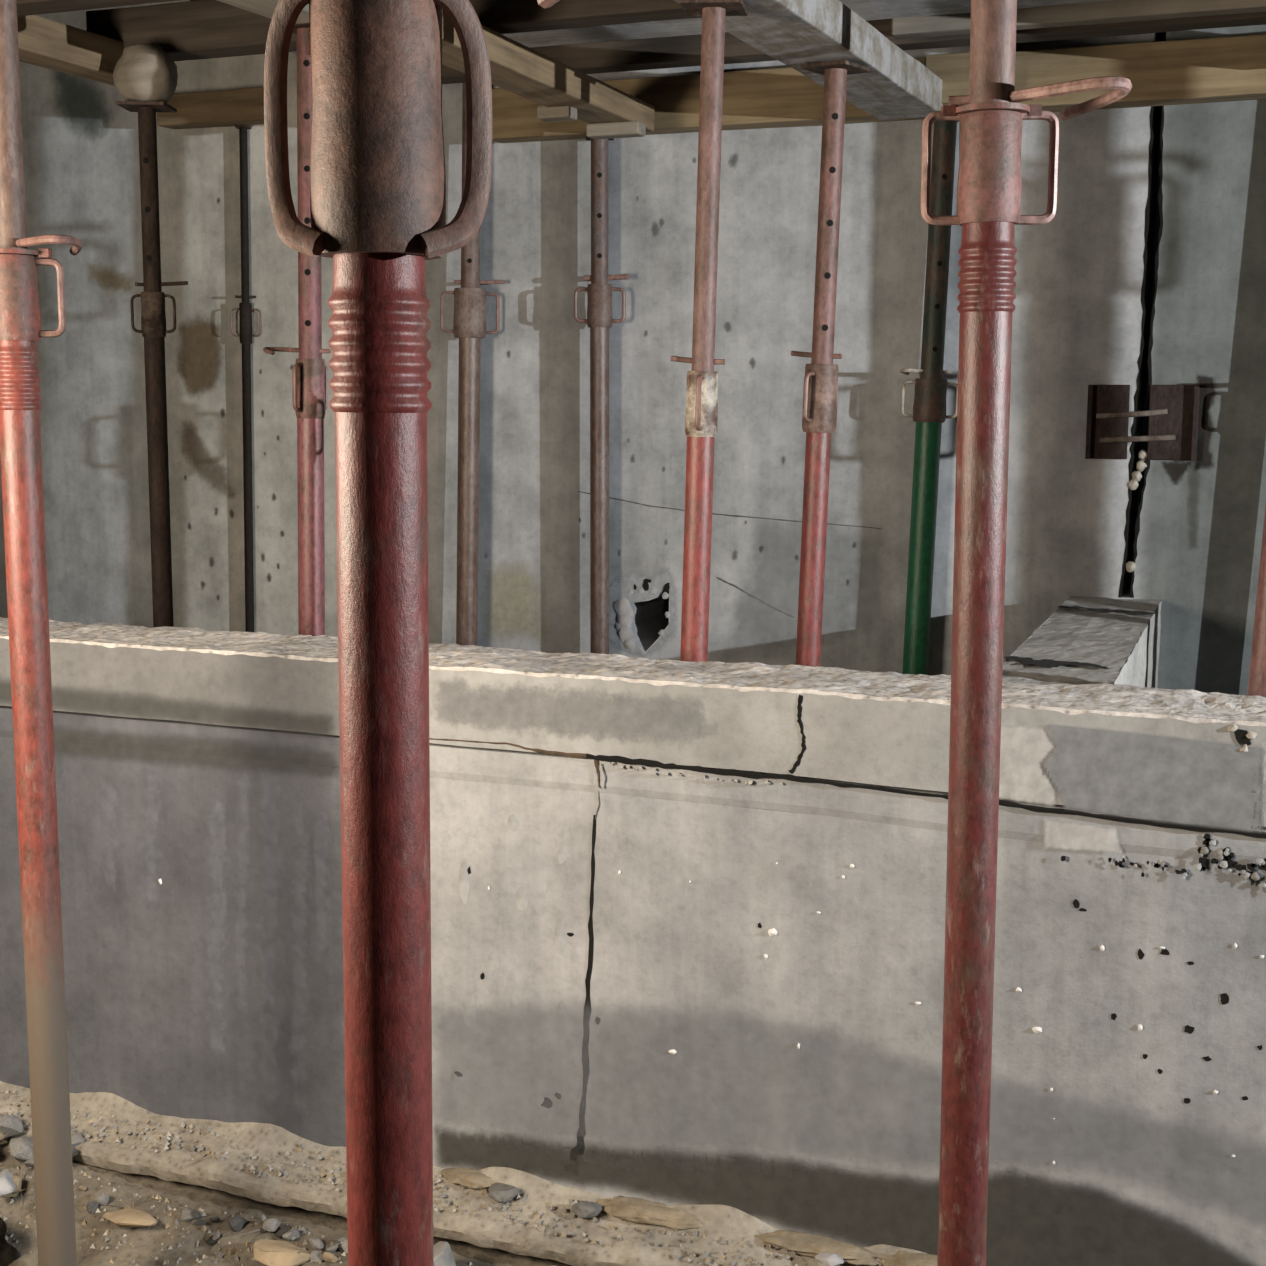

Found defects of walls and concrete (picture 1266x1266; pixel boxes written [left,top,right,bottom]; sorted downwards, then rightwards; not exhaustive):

spalling [613,579,670,652]
crack [999,799,1266,838]
crack [429,695,948,1161]